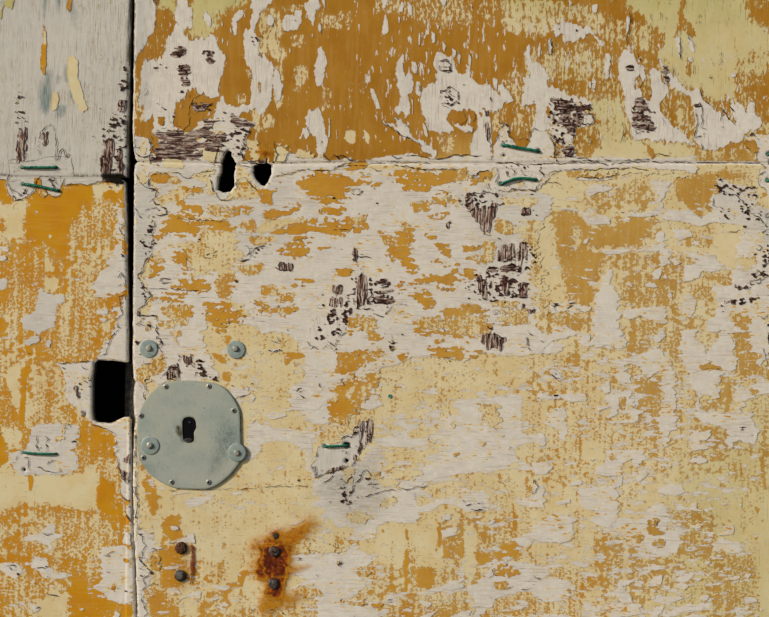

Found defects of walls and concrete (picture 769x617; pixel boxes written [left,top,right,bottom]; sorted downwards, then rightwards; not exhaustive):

peeling [134,0,325,131]
peeling [382,0,393,42]
peeling [548,19,605,55]
peeling [0,156,105,201]
peeling [602,49,769,450]
peeling [20,287,65,354]
peeling [89,41,699,617]
peeling [8,422,80,476]
peeling [686,430,711,464]
peeling [0,524,72,585]
corrosion [251,522,311,609]
peeling [513,449,744,617]